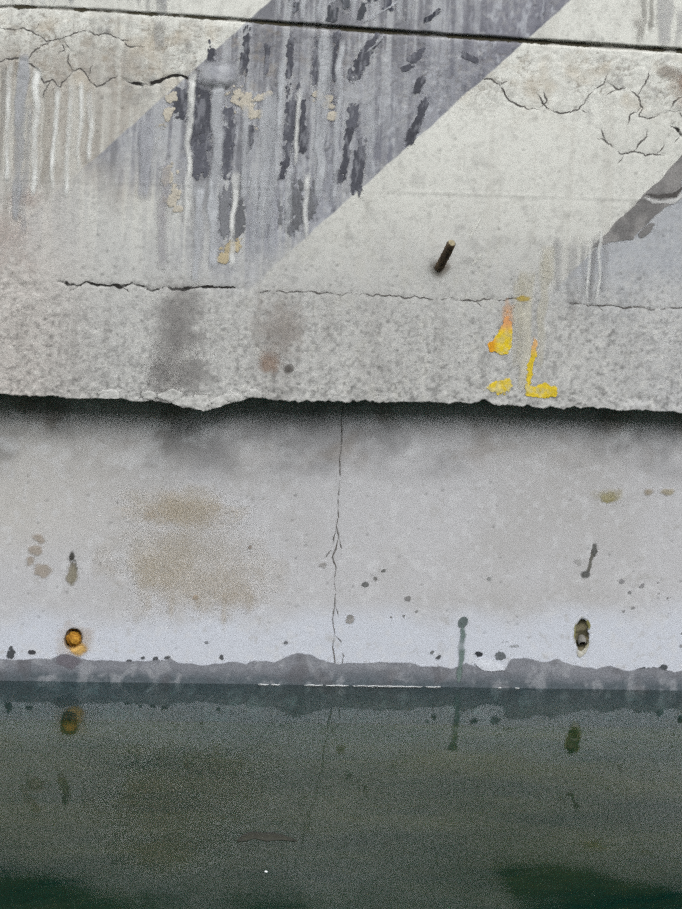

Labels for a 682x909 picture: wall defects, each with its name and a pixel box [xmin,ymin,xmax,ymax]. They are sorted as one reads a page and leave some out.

crack [0,24,240,97]
peeling [401,47,425,72]
peeling [458,51,479,63]
leakage [0,55,93,217]
peeling [159,25,273,264]
peeling [278,0,394,236]
peeling [404,76,429,145]
crack [484,73,682,163]
peeling [593,156,682,247]
crack [61,281,236,291]
crack [262,290,517,306]
crack [326,406,344,664]